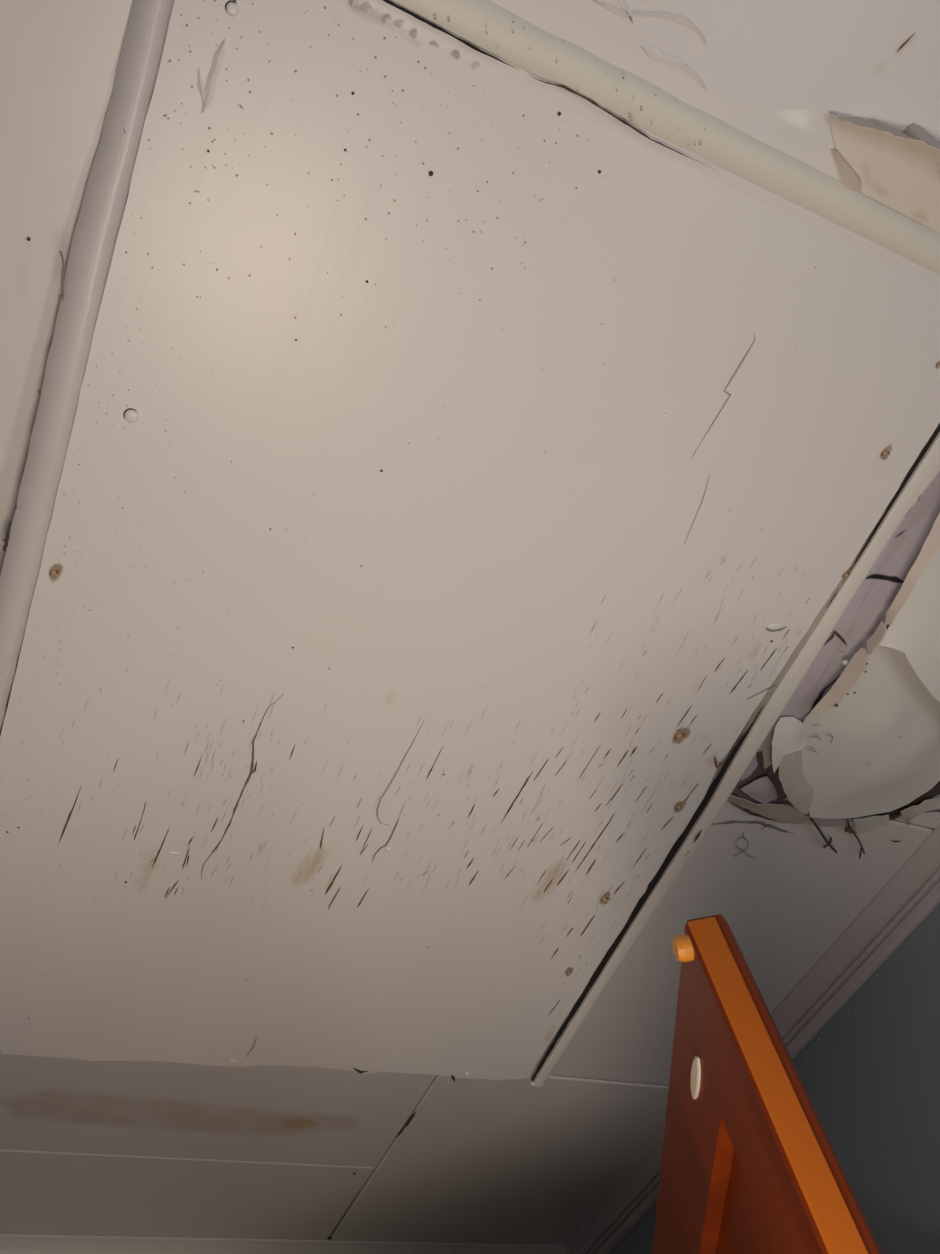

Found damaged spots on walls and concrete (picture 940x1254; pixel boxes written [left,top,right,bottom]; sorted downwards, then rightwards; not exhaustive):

crack [382,0,715,170]
peeling [829,113,940,233]
crack [684,334,756,544]
peeling [758,472,940,827]
crack [58,760,118,868]
crack [95,426,940,1080]
crack [396,1112,416,1138]